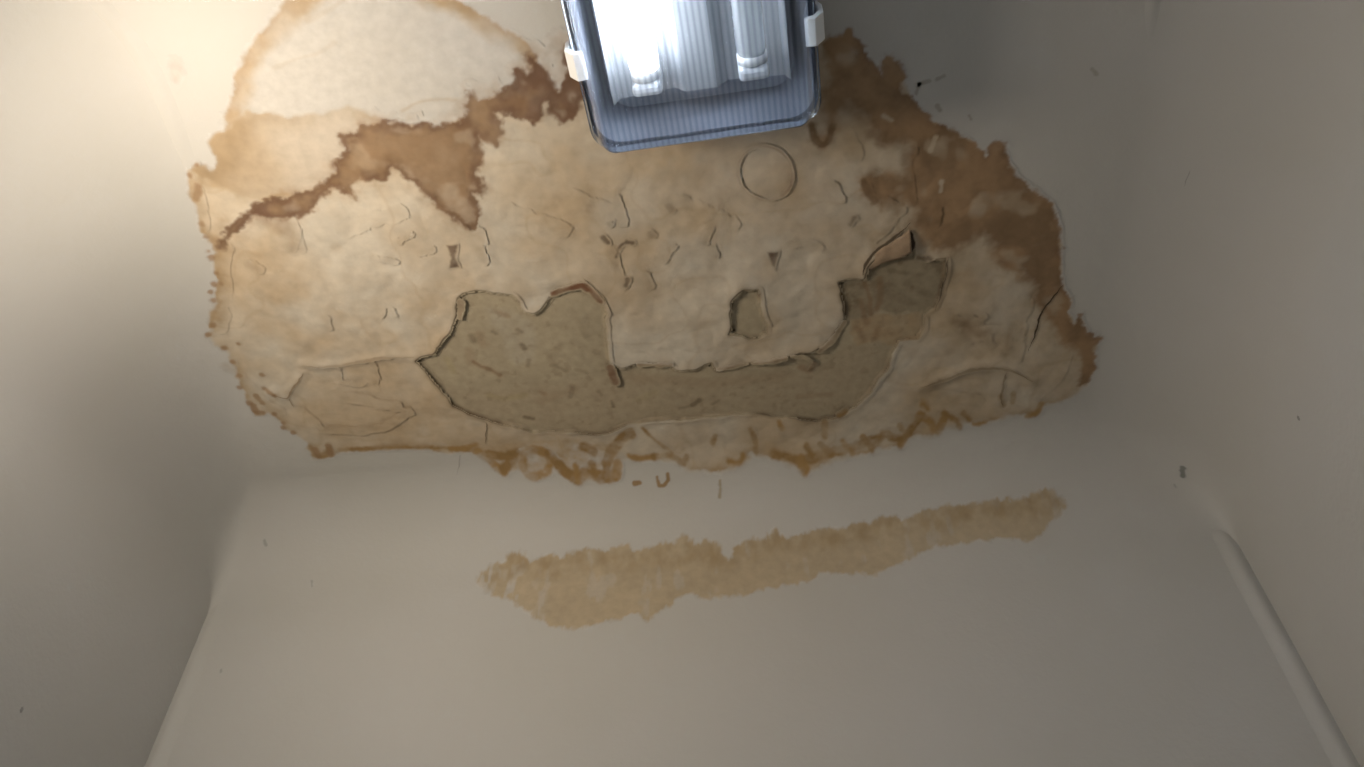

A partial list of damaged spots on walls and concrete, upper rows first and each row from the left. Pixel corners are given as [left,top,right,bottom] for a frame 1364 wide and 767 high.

leakage [183,0,1106,500]
peeling [412,223,952,438]
crack [1028,285,1063,351]
leakage [474,485,1069,633]